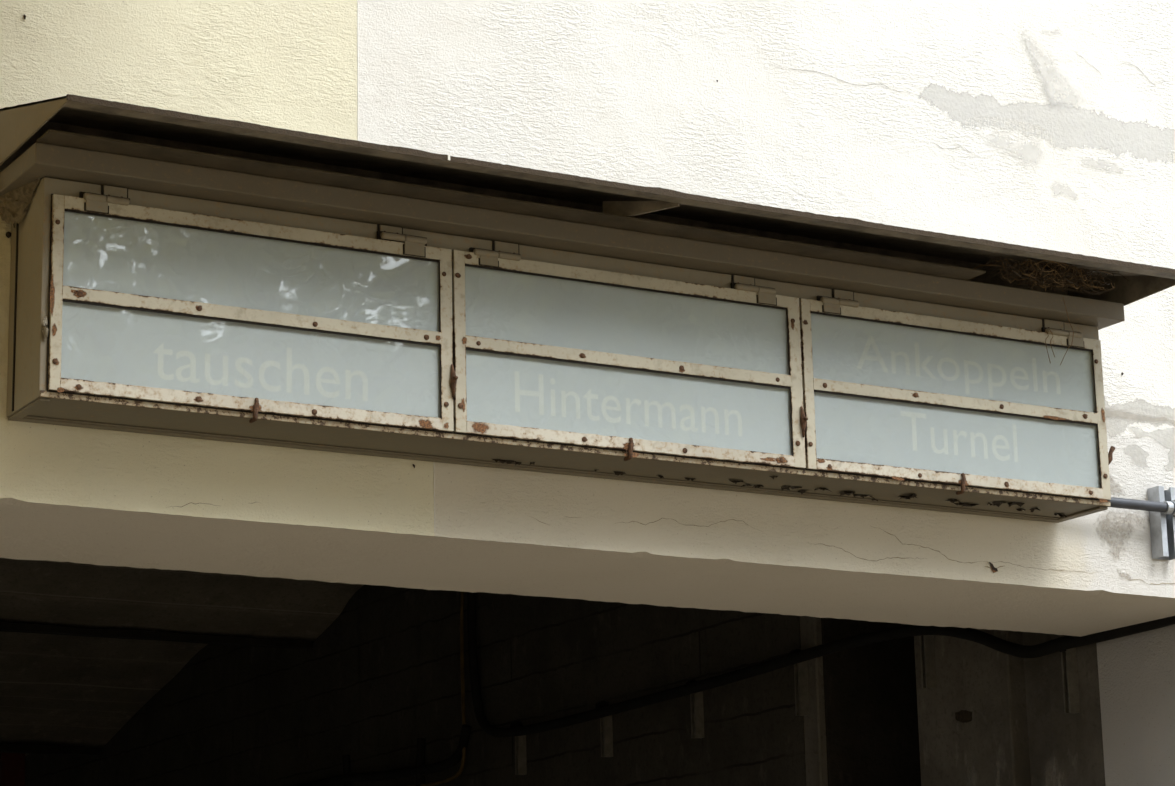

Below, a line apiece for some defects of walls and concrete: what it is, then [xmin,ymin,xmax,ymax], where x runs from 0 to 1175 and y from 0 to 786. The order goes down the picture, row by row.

peeling [920,85,1175,162]
peeling [1124,427,1175,470]
crack [811,526,1175,585]